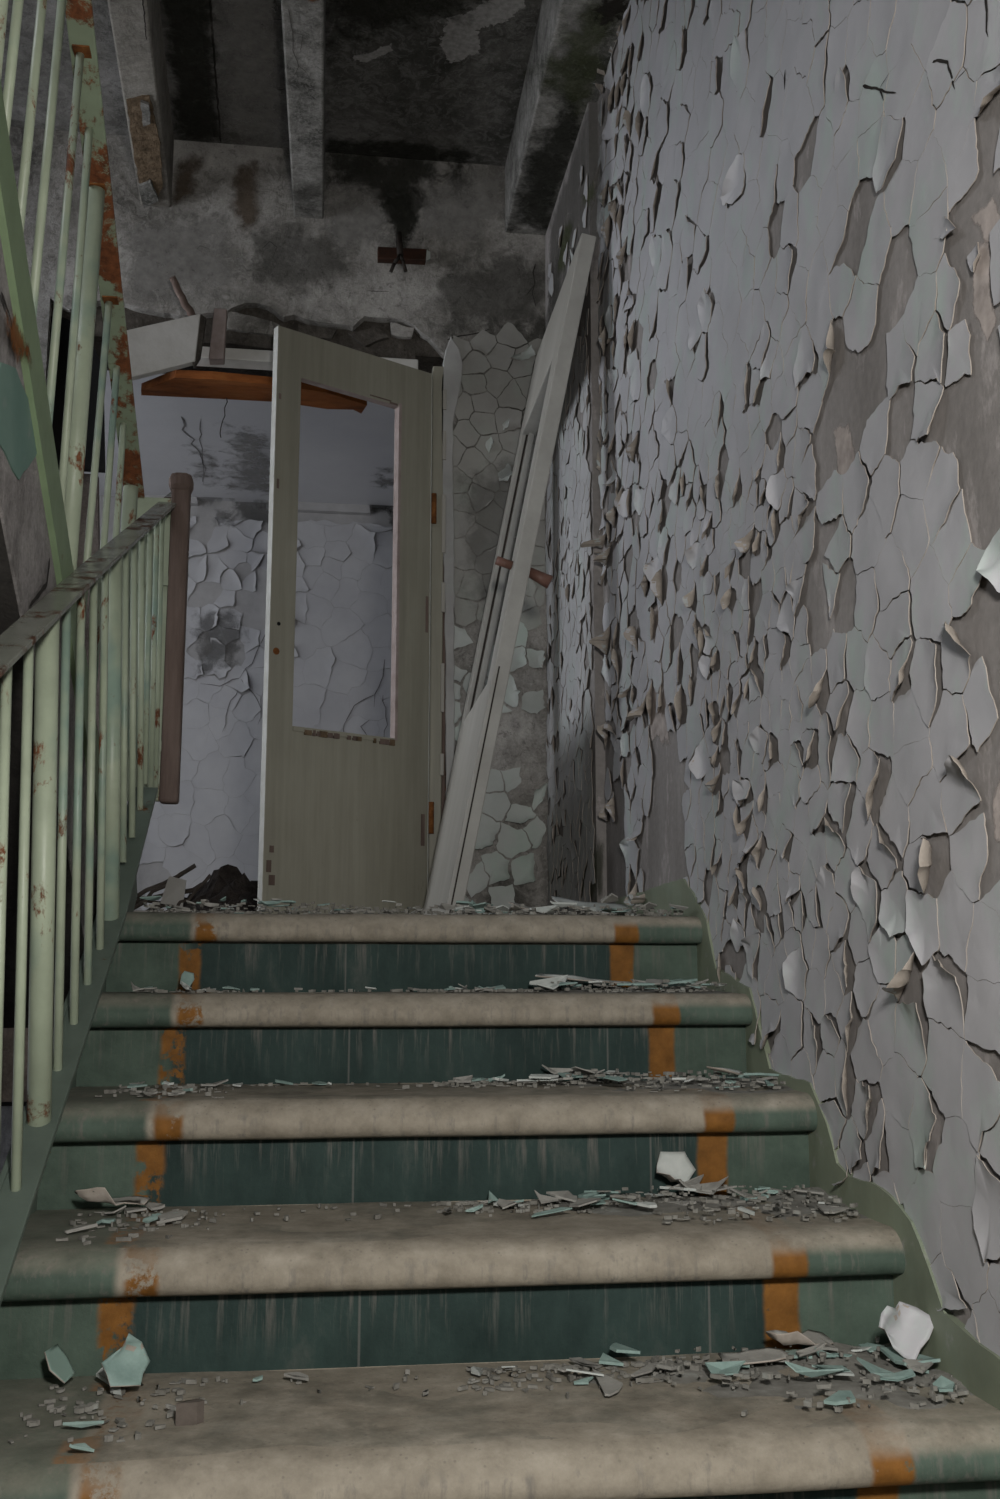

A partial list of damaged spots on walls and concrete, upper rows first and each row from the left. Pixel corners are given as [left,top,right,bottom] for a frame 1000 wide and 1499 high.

leakage [174,158,201,202]
leakage [330,163,505,248]
peeling [139,516,275,911]
peeling [292,520,393,738]
peeling [453,625,498,741]
peeling [464,0,1000,1359]
peeling [718,1329,834,1365]